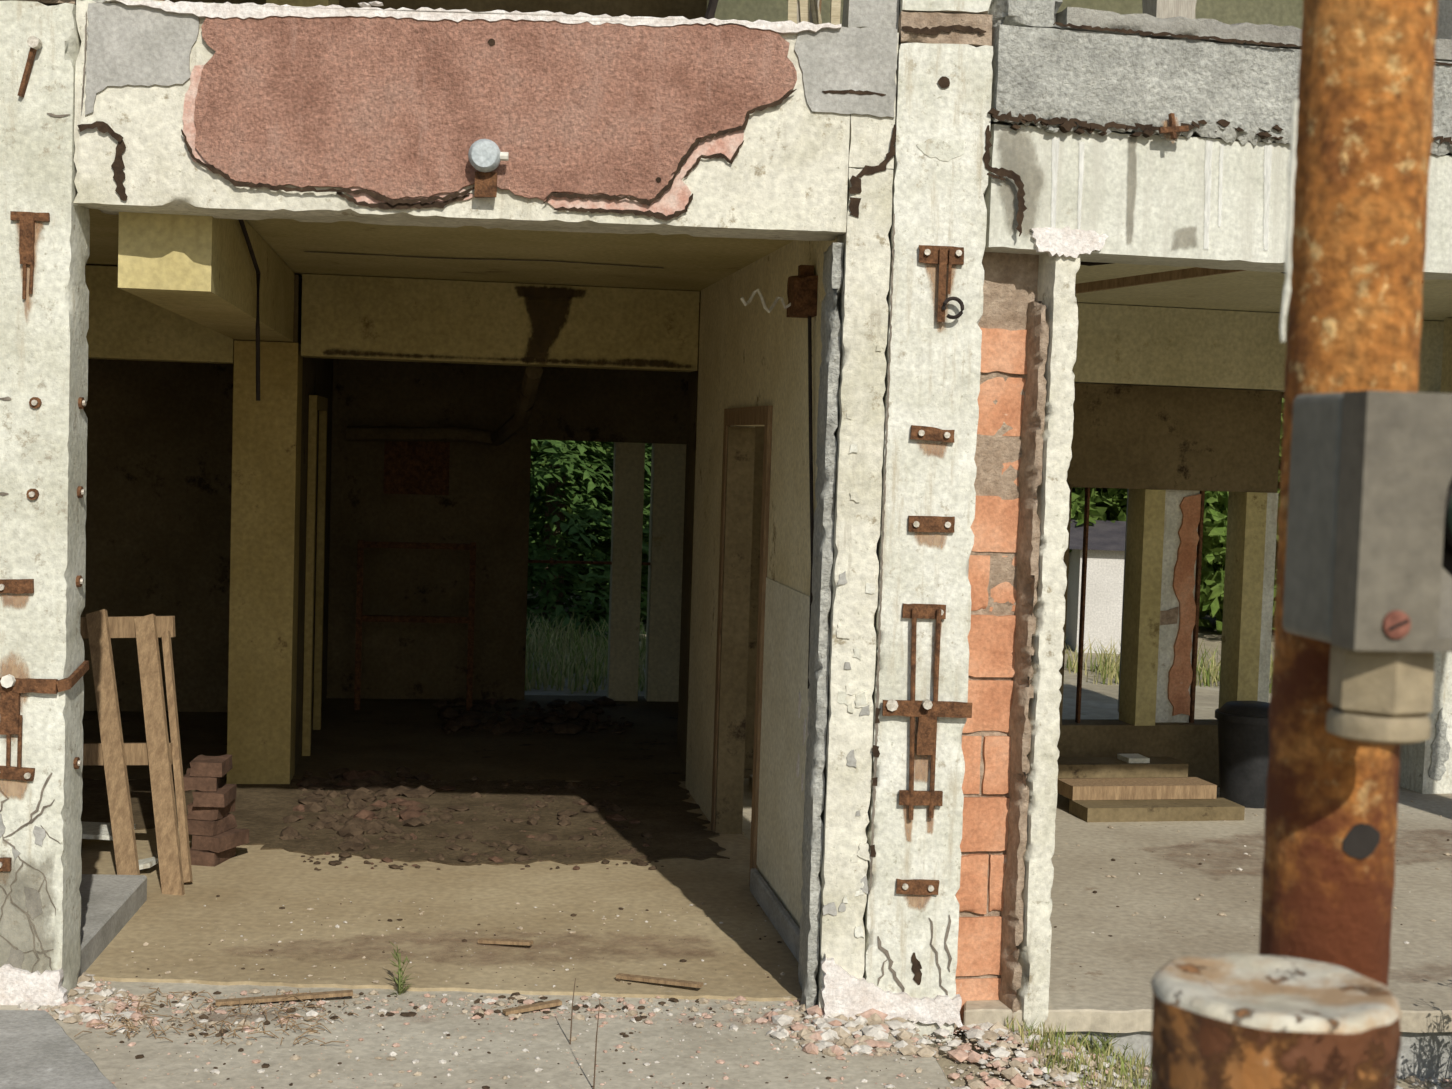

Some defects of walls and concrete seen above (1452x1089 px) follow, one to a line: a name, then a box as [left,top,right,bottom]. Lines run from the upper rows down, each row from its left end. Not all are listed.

flaking render [85,0,898,216]
spalling [1432,136,1452,144]
water stain [323,349,457,358]
water stain [479,286,691,368]
corrosion [926,264,956,331]
crack [849,124,896,891]
spalling [1160,494,1201,716]
corrosion [0,658,28,705]
corrosion [914,720,931,782]
corrosion [904,805,935,841]
crack [0,773,60,973]
crack [877,914,952,995]